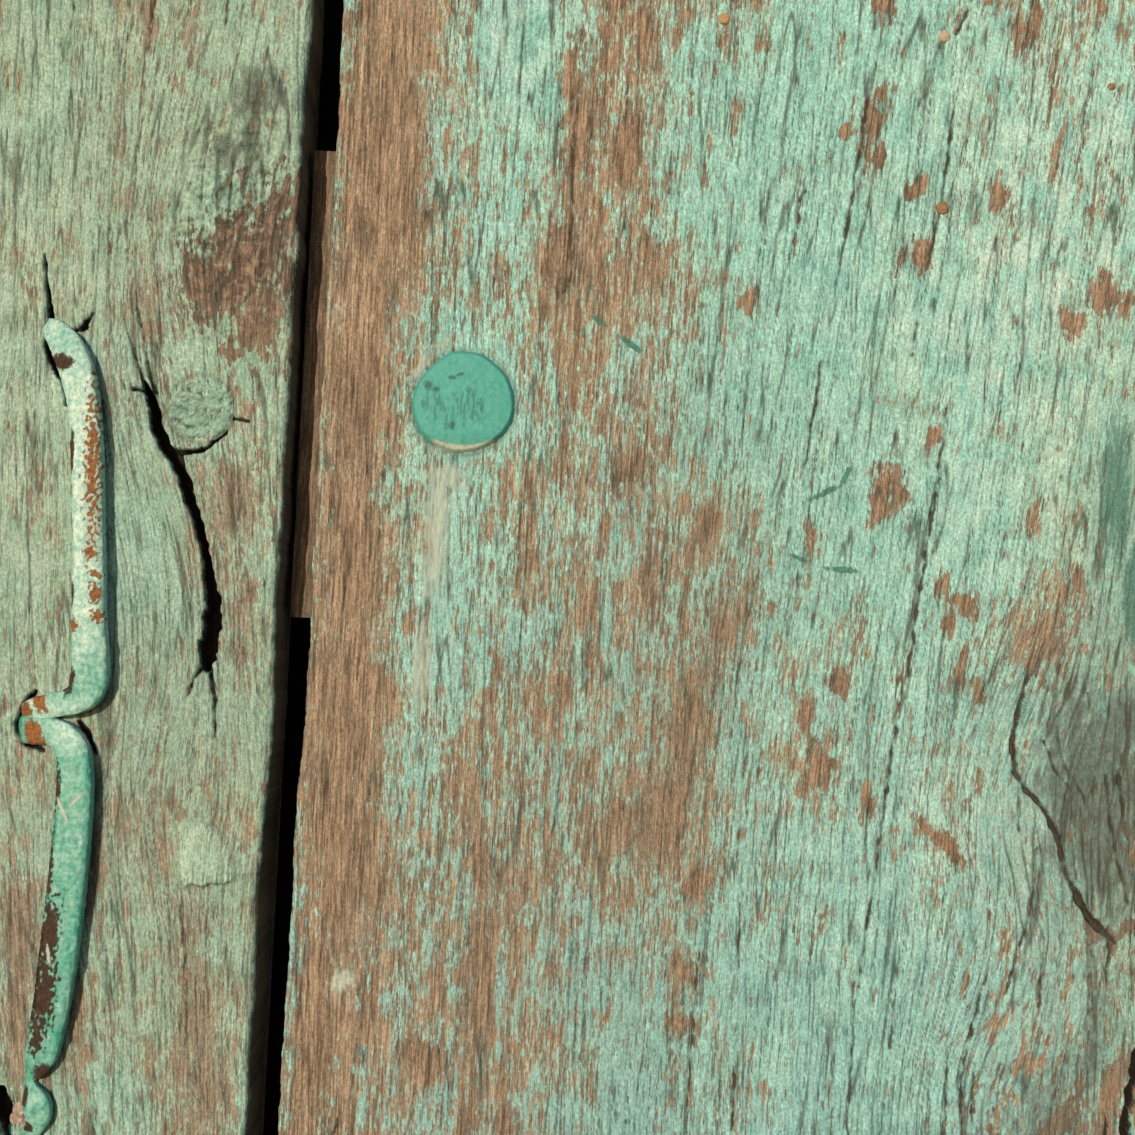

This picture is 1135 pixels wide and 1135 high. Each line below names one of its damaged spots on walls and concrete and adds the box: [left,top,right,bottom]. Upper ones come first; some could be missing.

peeling [836,70,897,182]
peeling [99,154,303,427]
corrosion [21,695,48,745]
corrosion [28,762,64,1059]
corrosion [79,371,107,624]
crack [45,241,250,738]
peeling [144,820,236,1135]
peeling [278,0,483,1135]
peeling [601,488,780,1049]
peeling [865,444,911,531]
peeling [933,562,1098,718]
crack [927,675,1135,1135]